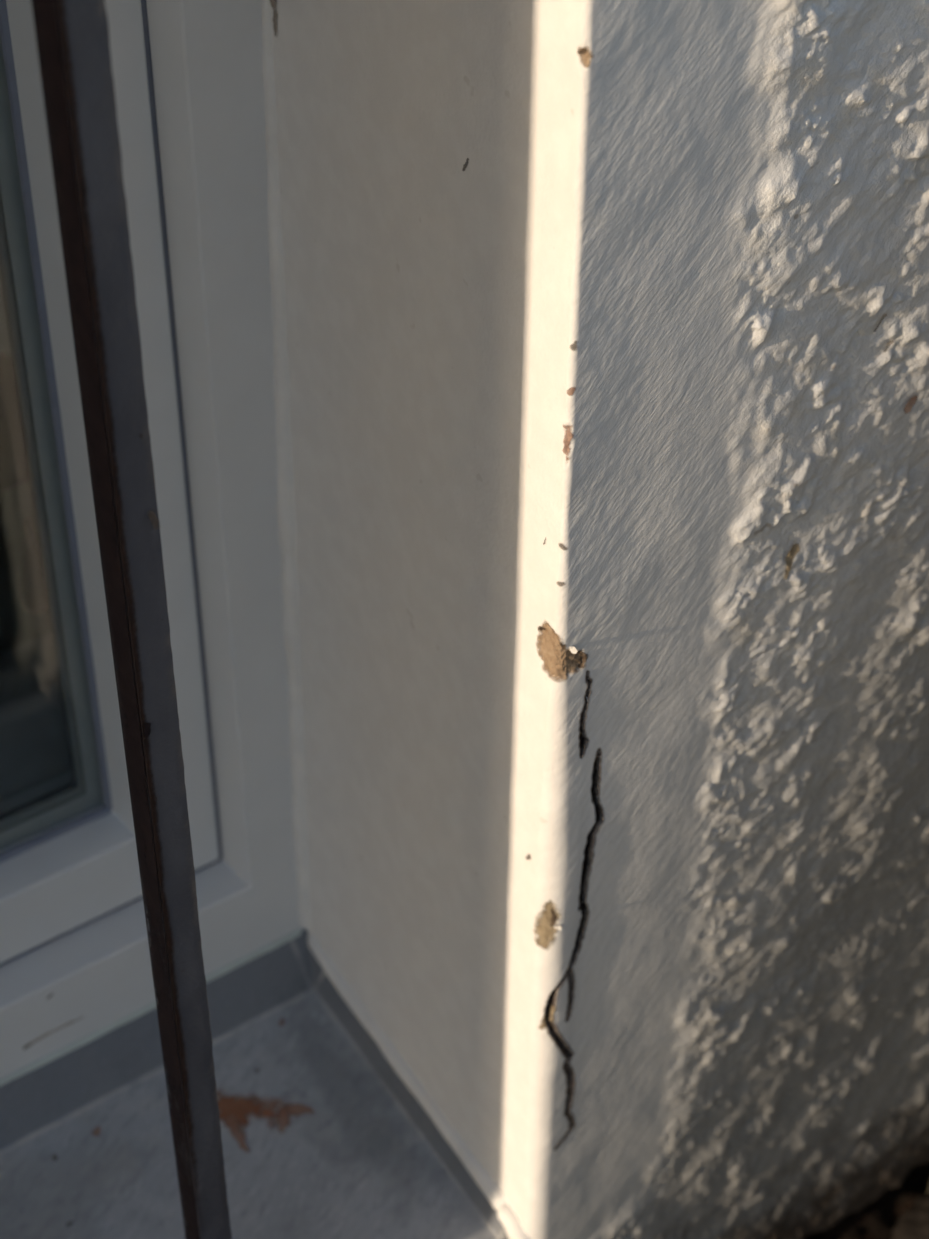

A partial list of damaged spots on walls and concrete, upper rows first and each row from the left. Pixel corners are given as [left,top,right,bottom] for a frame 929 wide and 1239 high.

flaking render [537,622,588,681]
flaking render [535,902,562,949]
crack [539,671,605,1151]
rust [217,1092,314,1152]